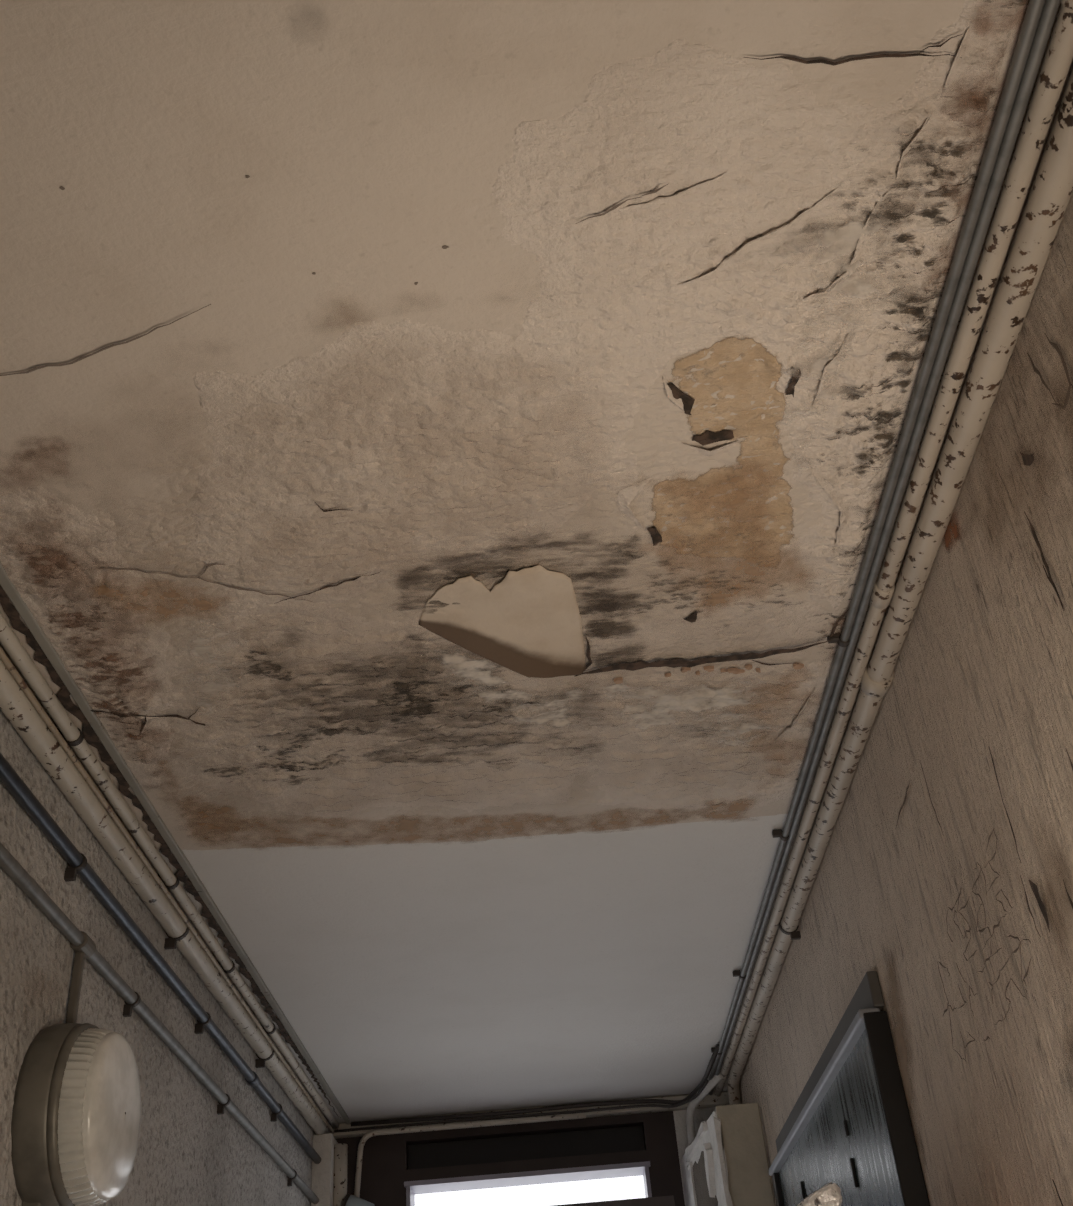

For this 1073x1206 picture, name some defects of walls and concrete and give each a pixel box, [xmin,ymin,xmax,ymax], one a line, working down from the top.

crack [744,34,962,66]
crack [0,304,211,376]
flaking render [615,0,1020,624]
mould [827,88,998,474]
water stain [400,540,586,610]
water stain [575,471,788,666]
water stain [51,585,214,740]
water stain [246,651,289,681]
water stain [205,657,528,785]
peeling [146,564,832,818]